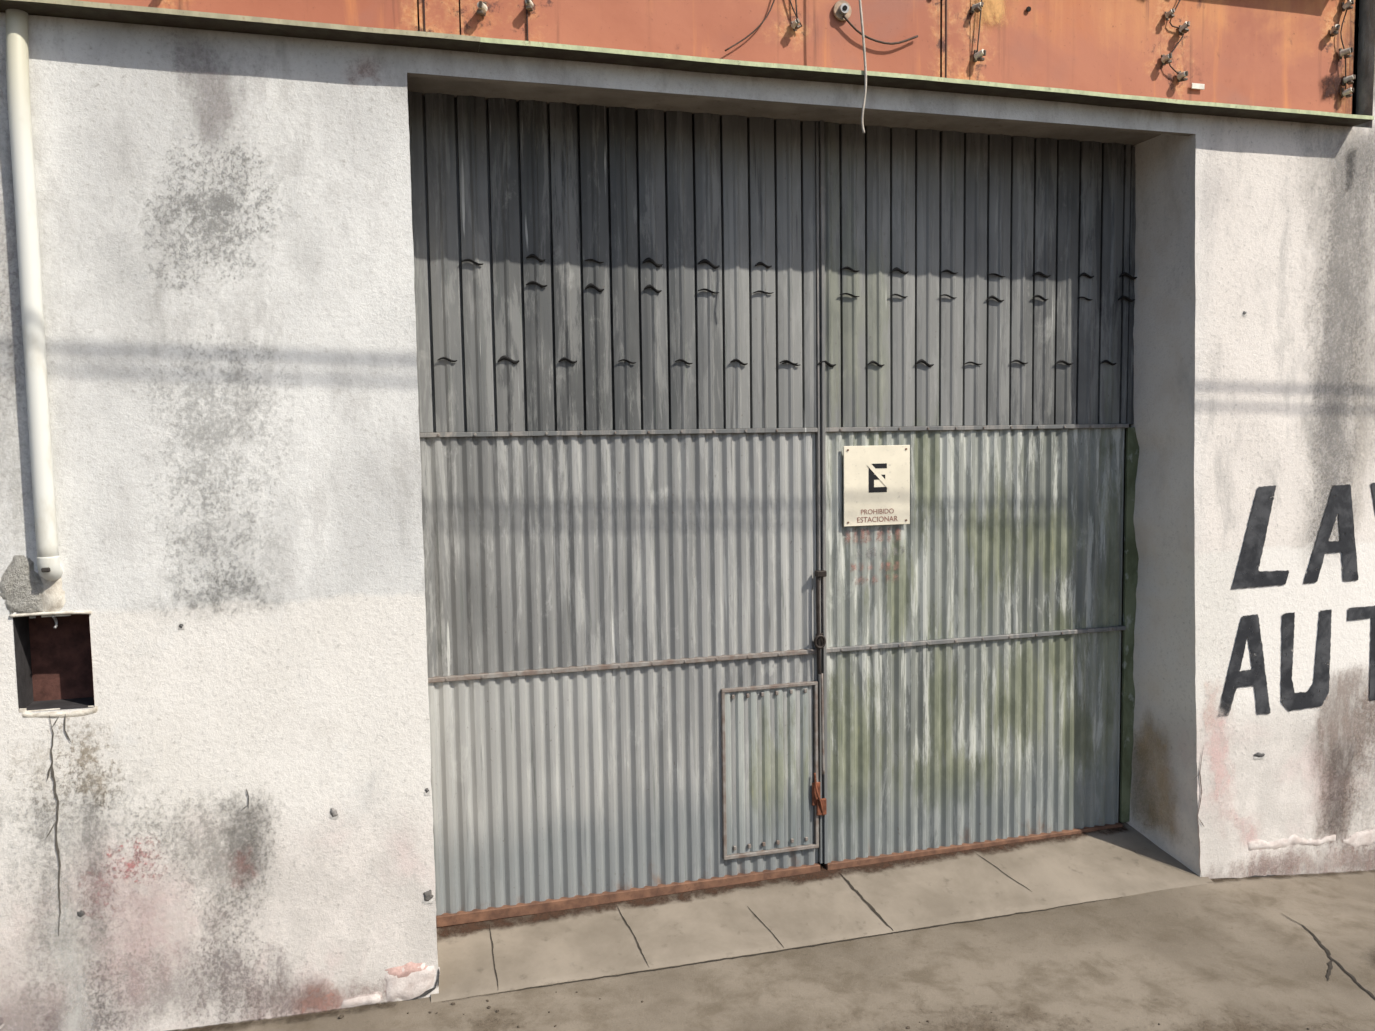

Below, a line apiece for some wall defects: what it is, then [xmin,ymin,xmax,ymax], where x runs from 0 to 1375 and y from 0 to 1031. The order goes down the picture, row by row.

rust [978,0,1005,22]
rust [1322,74,1346,100]
crack [46,715,71,936]
crack [1195,745,1277,879]
water stain [1318,677,1375,835]
flaking render [299,962,440,1013]